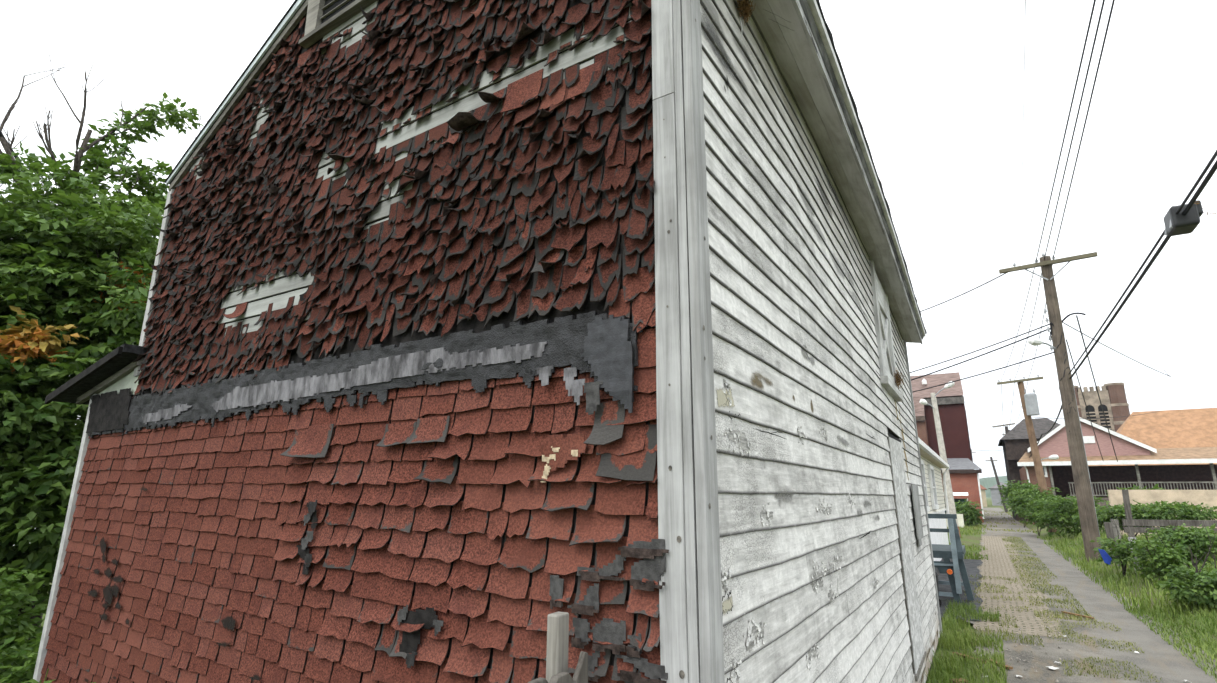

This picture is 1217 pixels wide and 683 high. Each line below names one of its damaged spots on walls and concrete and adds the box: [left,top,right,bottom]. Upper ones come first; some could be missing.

peeling [319,0,378,69]
peeling [246,92,277,150]
peeling [362,2,632,242]
peeling [190,156,210,181]
peeling [308,143,357,199]
peeling [218,256,315,337]
peeling [724,427,752,456]
peeling [760,502,773,526]
peeling [810,556,842,606]
peeling [730,617,766,683]